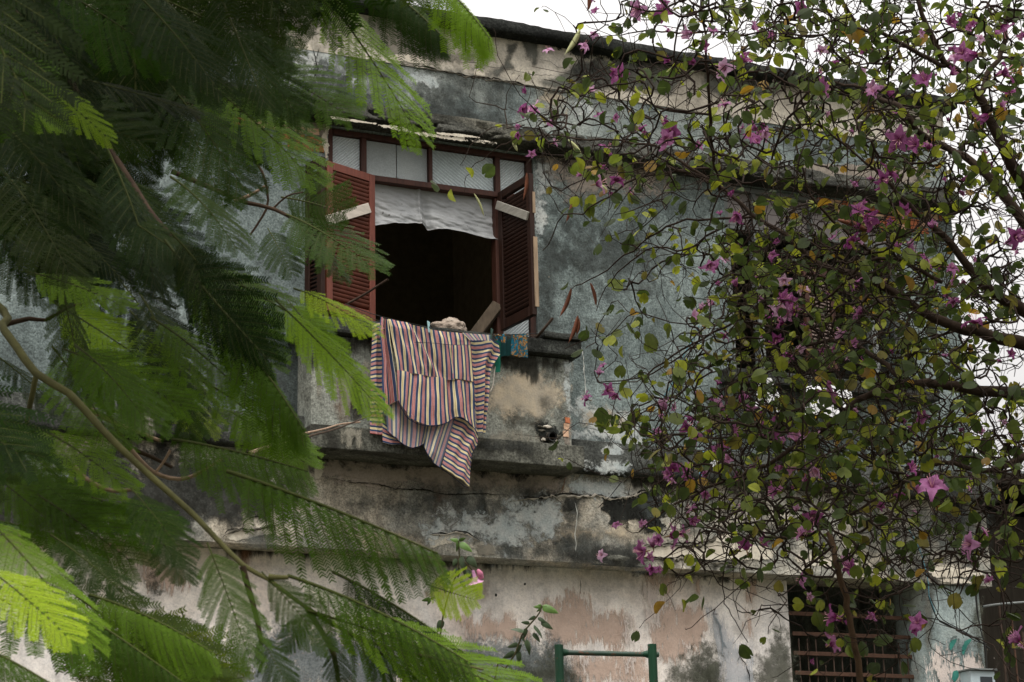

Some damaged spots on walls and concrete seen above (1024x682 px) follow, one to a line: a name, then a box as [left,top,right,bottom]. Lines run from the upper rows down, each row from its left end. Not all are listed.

efflorescence [407,72,439,89]
damp [493,38,538,75]
peeling [236,116,497,158]
damp [322,362,686,570]
crack [333,477,663,551]
peeling [457,587,649,682]
peeling [645,573,708,666]